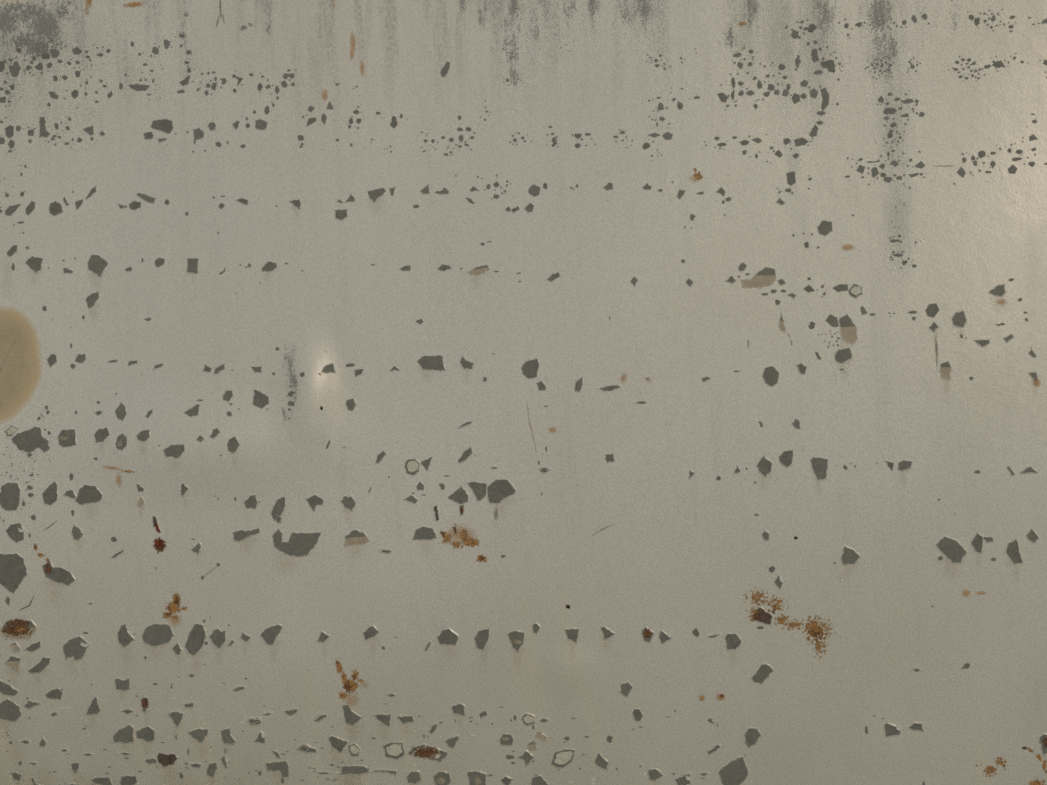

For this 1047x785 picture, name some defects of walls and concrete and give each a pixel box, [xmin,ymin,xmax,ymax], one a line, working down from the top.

peeling [0,34,297,152]
peeling [704,19,843,206]
peeling [725,262,894,375]
corrosion [153,524,166,553]
peeling [232,494,322,558]
corrosion [440,526,486,562]
peeling [412,478,517,541]
corrosion [2,619,32,635]
corrosion [162,593,187,621]
peeling [116,623,284,665]
corrosion [745,587,833,657]
corrosion [336,660,364,702]